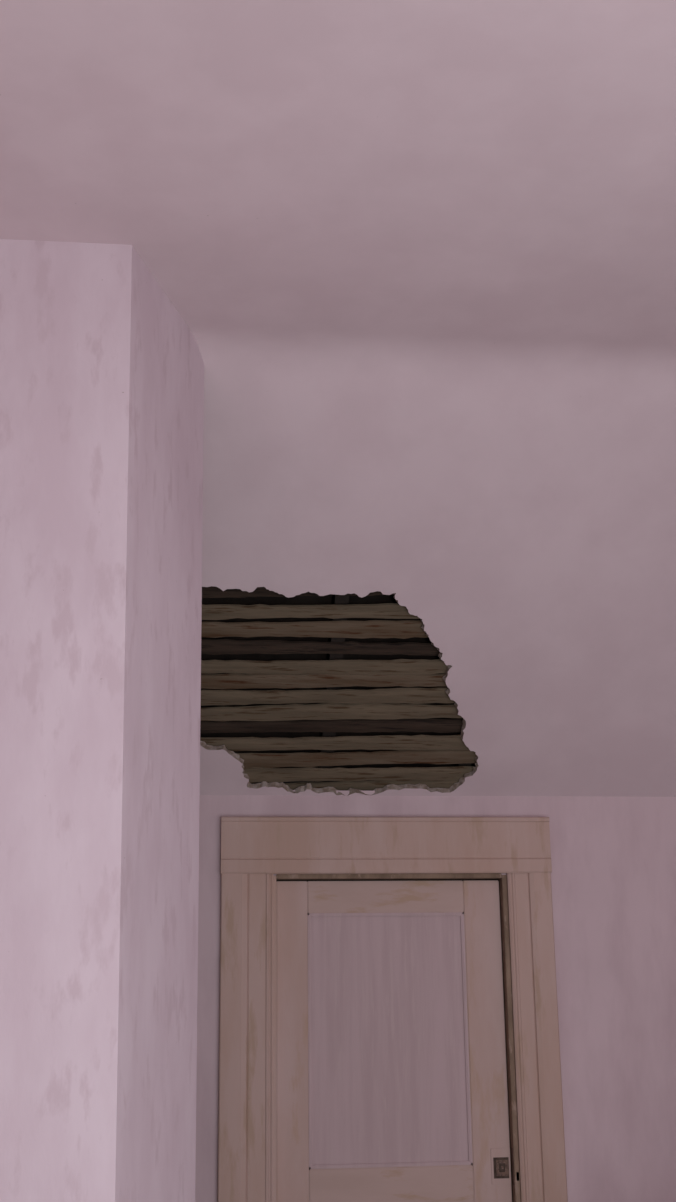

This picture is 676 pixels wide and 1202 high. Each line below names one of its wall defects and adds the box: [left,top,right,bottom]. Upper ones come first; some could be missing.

flaking render [200,586,479,795]